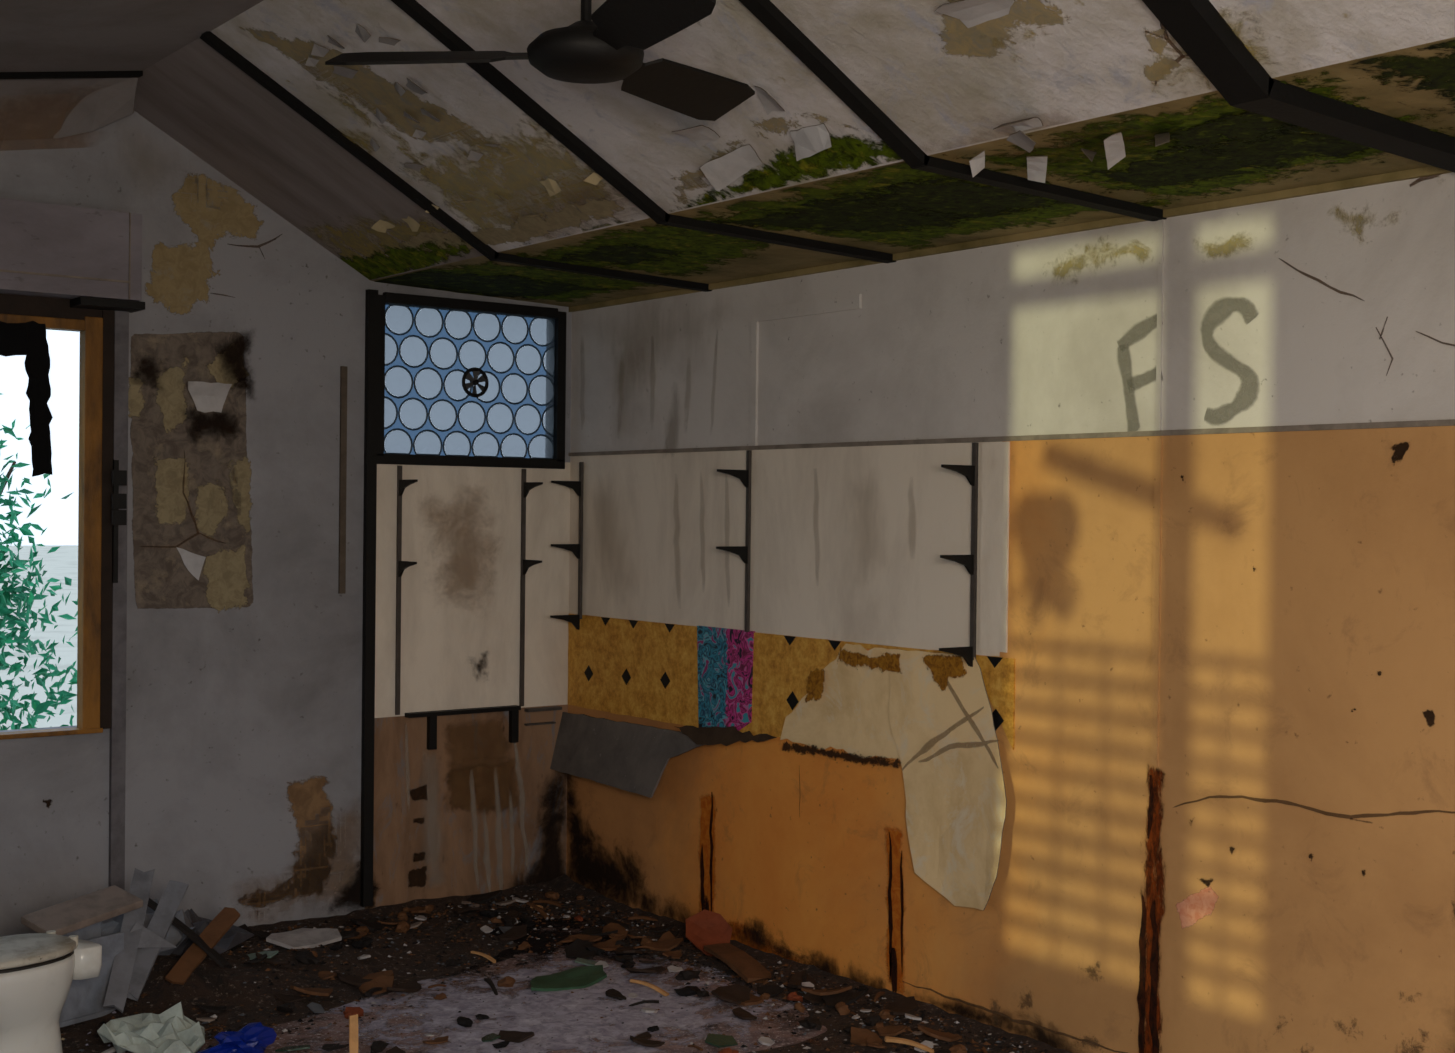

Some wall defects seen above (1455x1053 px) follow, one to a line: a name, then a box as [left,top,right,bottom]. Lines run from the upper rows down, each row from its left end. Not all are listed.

peeling [240,24,507,162]
damp [335,95,609,230]
peeling [145,173,264,315]
damp [1054,238,1148,278]
crack [1279,258,1455,376]
peeling [128,332,253,613]
damp [447,721,517,812]
corrosion [699,792,716,912]
peeling [780,644,1007,910]
corrosion [885,828,904,994]
corrosion [1137,766,1165,1053]
crack [1175,795,1455,823]